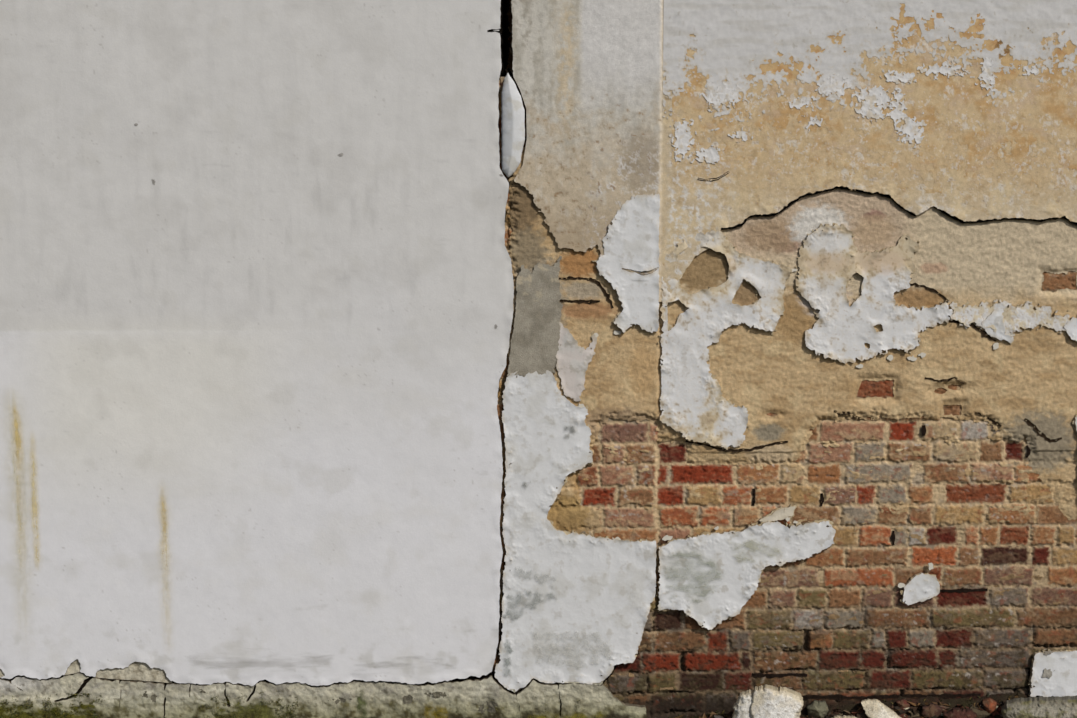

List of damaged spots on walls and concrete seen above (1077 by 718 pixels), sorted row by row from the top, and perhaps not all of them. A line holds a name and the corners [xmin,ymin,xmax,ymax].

crack [487,0,527,262]
peeling [667,3,1077,193]
crack [721,186,1077,230]
peeling [591,193,1077,450]
spalling [65,659,81,675]
spalling [95,662,172,702]
crack [0,371,562,718]
peeling [494,322,836,692]
peeling [897,563,940,605]
peeling [1027,648,1077,697]